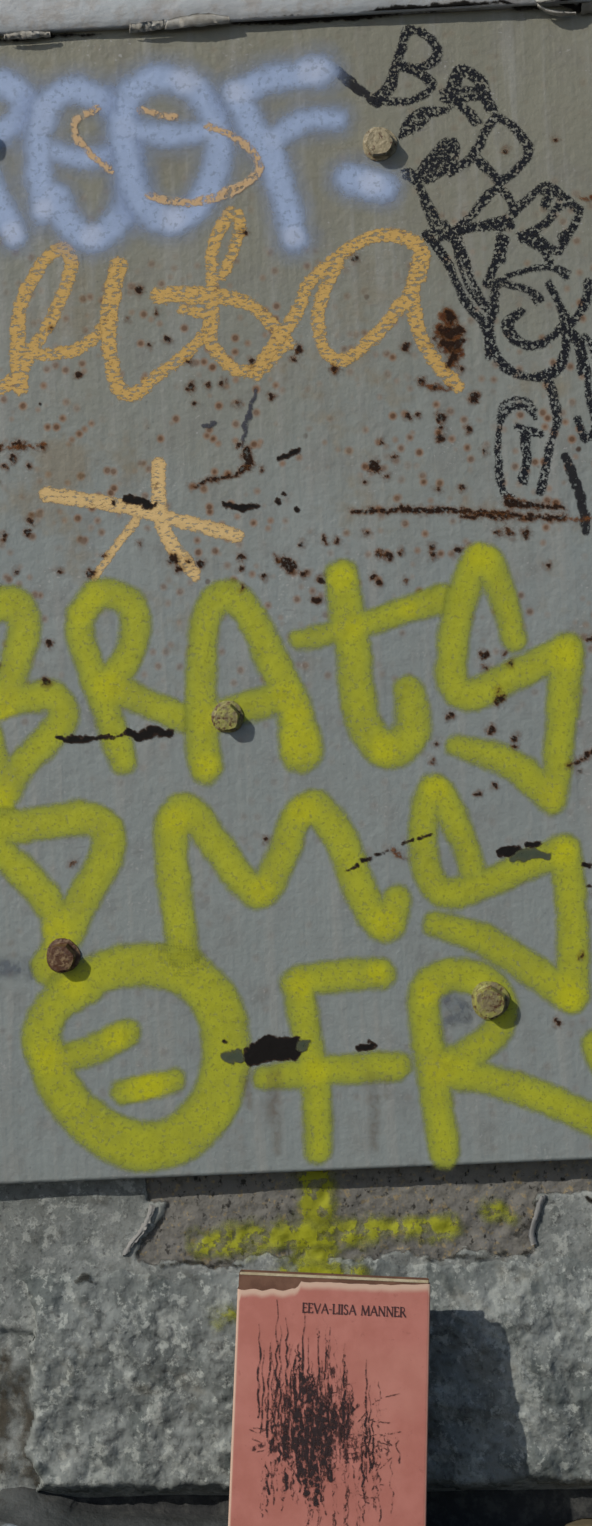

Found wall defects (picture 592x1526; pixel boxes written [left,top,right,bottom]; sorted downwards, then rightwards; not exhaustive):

rust [431,307,466,372]
rust [185,359,227,405]
rust [417,376,451,391]
rust [404,411,447,443]
rust [0,439,47,469]
rust [193,442,264,488]
rust [363,439,398,484]
rust [350,484,591,540]
rust [168,553,204,572]
rust [261,542,325,604]
rust [370,548,403,586]
rust [478,650,513,670]